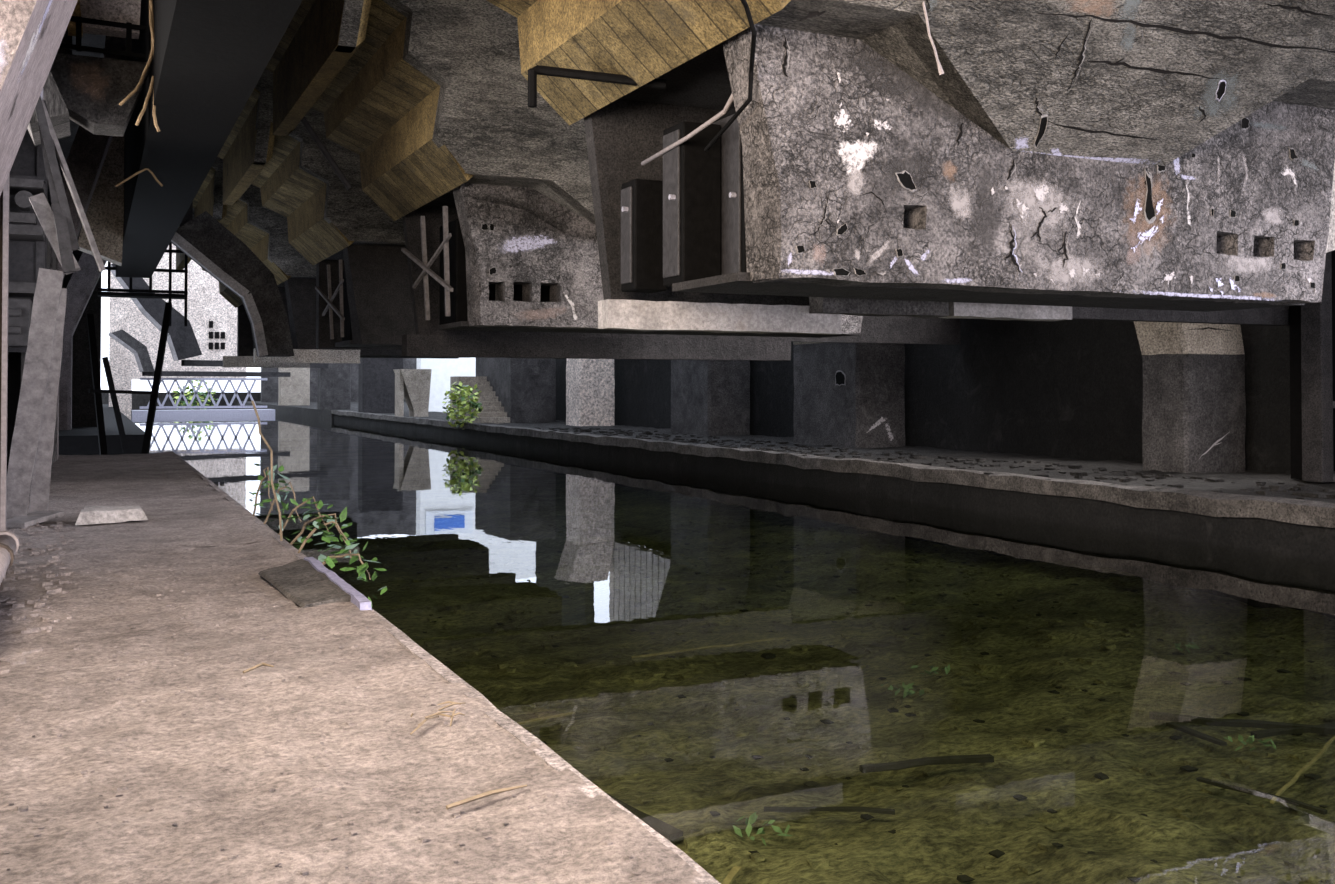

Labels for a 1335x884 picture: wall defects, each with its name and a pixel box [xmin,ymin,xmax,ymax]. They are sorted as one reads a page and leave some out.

crack [1266,4,1332,16]
peeling [834,102,892,136]
crack [1035,13,1335,186]
spalling [895,170,917,192]
crack [1005,207,1070,273]
spalling [1130,165,1166,253]